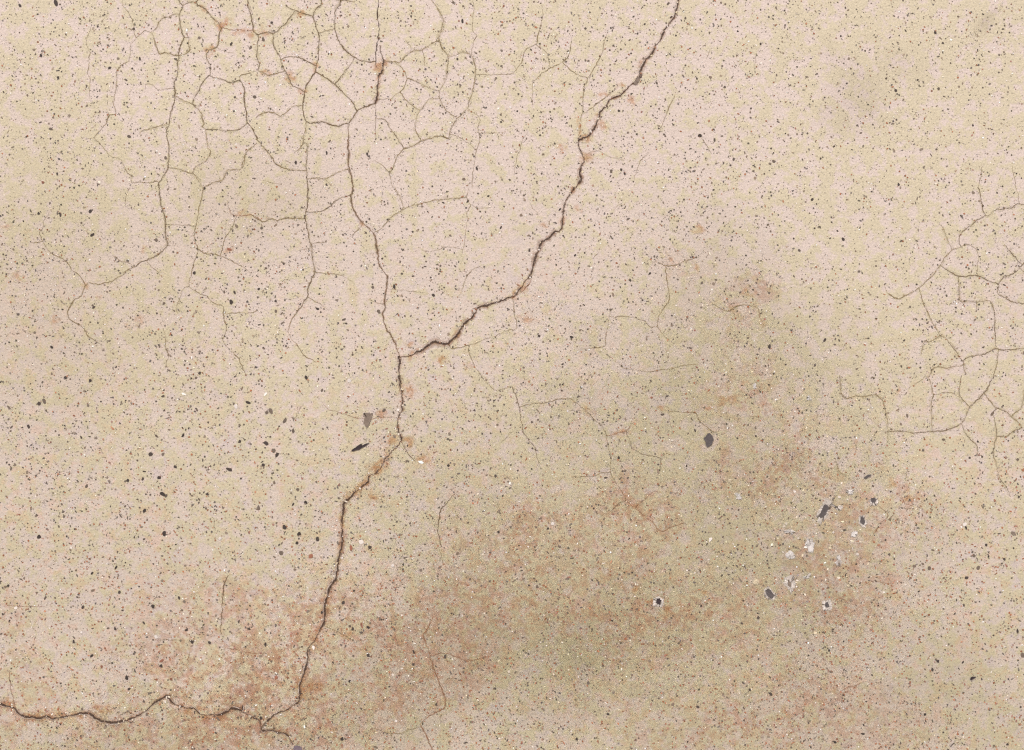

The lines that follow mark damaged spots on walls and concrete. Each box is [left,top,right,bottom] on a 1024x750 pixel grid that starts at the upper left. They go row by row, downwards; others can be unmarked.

crack [0,0,701,748]
crack [840,164,1024,492]